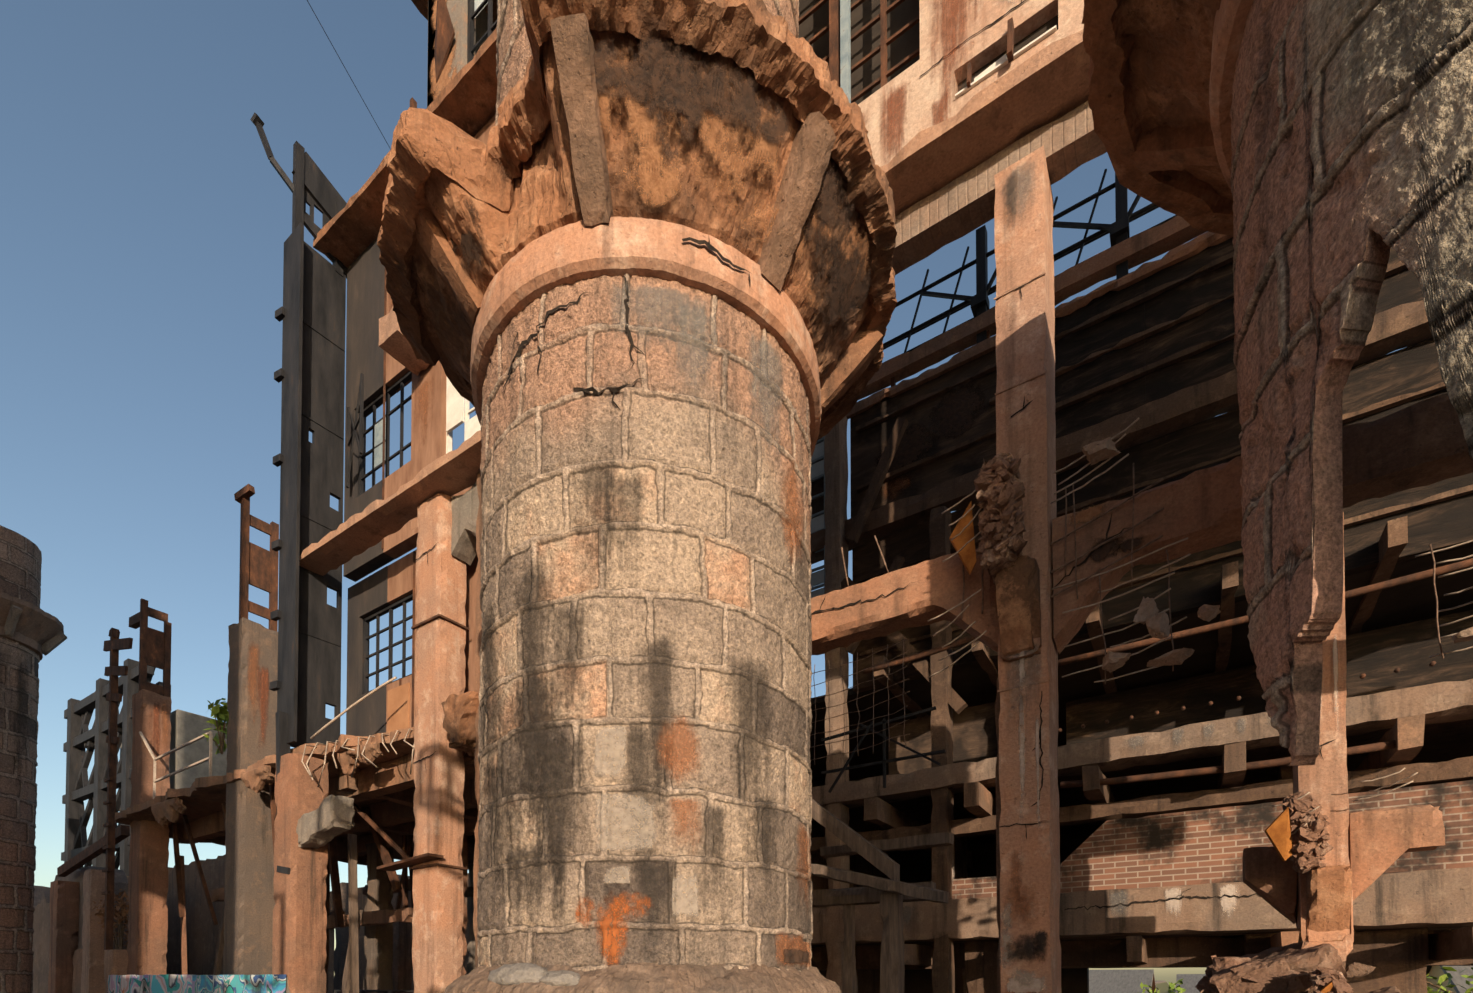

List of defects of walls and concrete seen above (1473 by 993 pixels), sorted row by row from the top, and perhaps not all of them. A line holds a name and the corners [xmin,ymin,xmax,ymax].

crack [682,237,751,288]
leakage [585,464,640,529]
leakage [481,570,581,904]
leakage [733,665,767,793]
leakage [626,642,675,921]
leakage [706,809,723,867]
leakage [756,800,772,872]
rust [575,895,649,964]